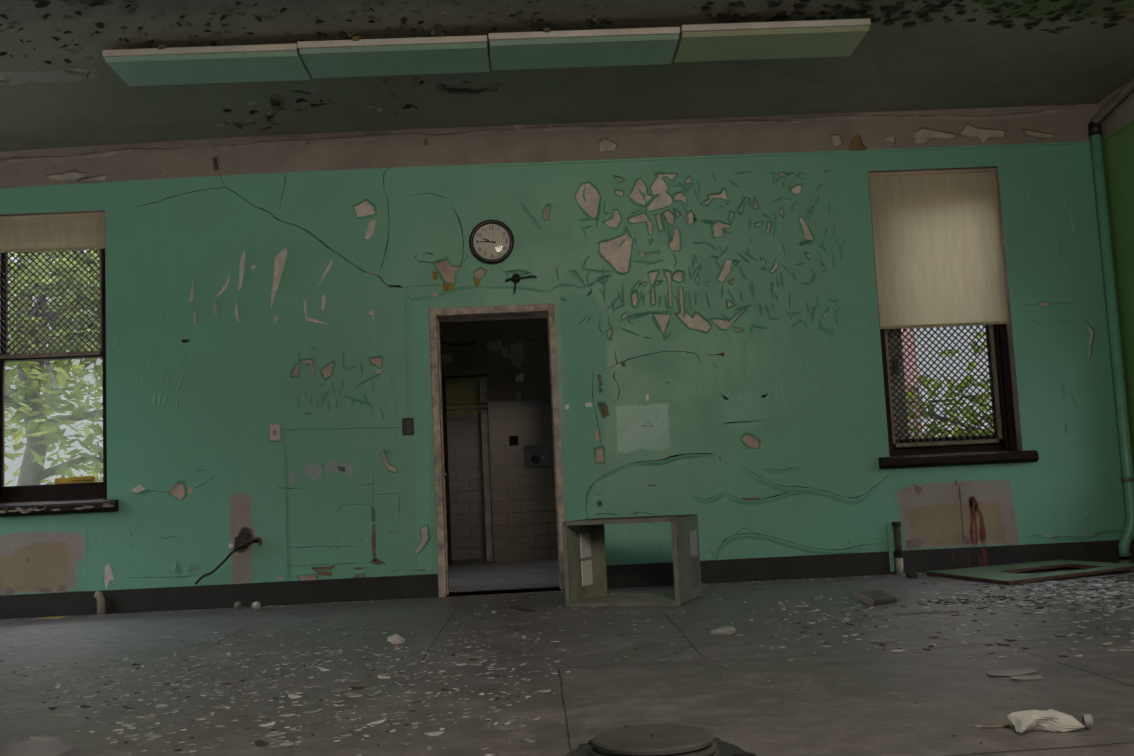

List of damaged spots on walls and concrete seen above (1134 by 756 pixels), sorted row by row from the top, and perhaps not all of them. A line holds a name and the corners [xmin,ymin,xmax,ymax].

peeling [20,0,287,65]
peeling [214,251,256,322]
crack [131,168,405,289]
peeling [271,248,287,323]
peeling [352,198,377,239]
crack [417,193,464,268]
crack [519,201,551,230]
peeling [407,170,845,342]
peeling [0,503,114,513]
crack [584,453,892,560]
flaking render [0,529,87,595]
peeling [104,564,114,589]